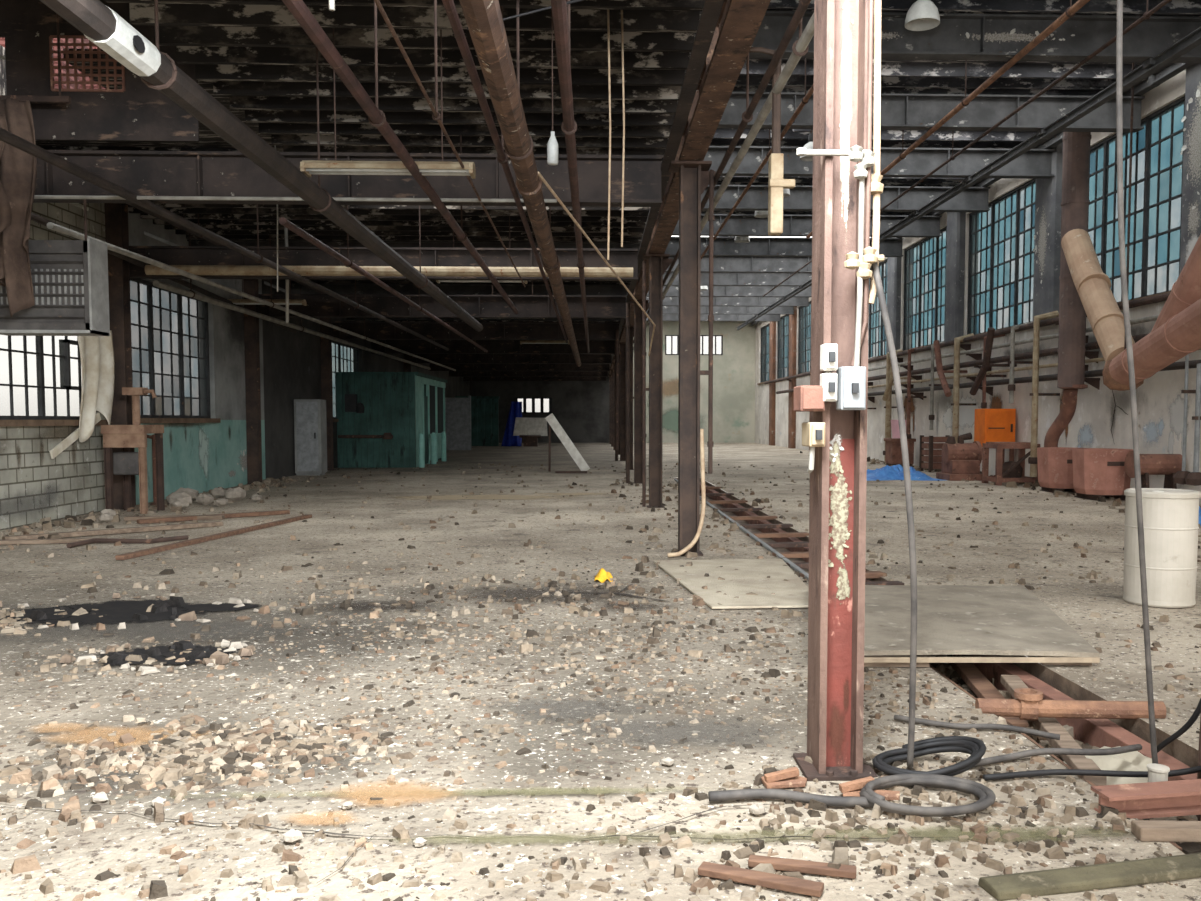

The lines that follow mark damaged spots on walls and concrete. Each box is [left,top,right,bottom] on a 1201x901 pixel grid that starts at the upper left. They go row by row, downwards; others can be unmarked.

peeling [960,28,1075,44]
damp [40,427,77,462]
peeling [828,429,852,605]